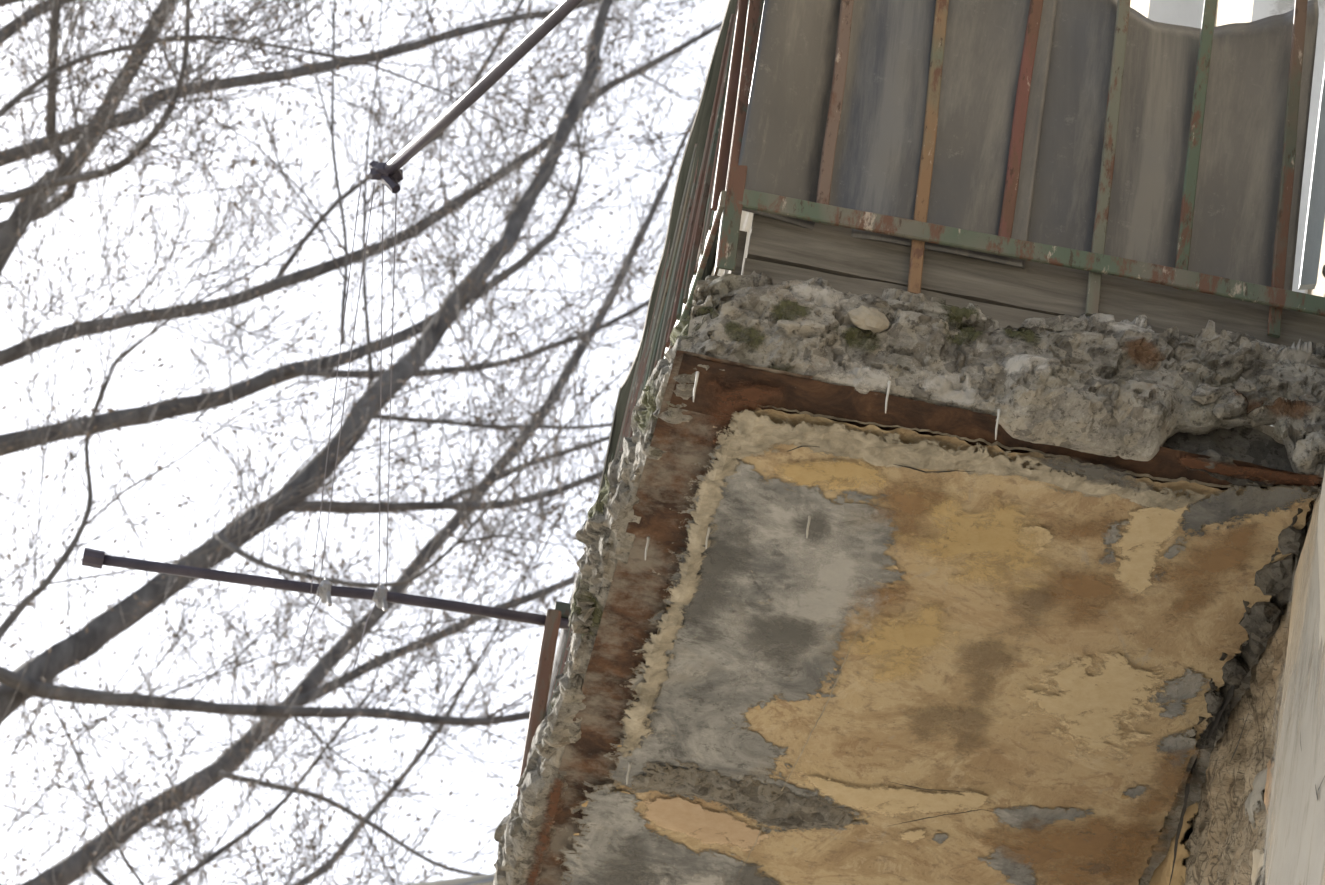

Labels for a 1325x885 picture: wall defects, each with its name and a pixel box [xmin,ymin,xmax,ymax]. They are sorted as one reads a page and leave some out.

rust [701,381,782,445]
leakage [682,502,880,682]
spalling [493,271,1325,885]
crack [1169,684,1249,885]